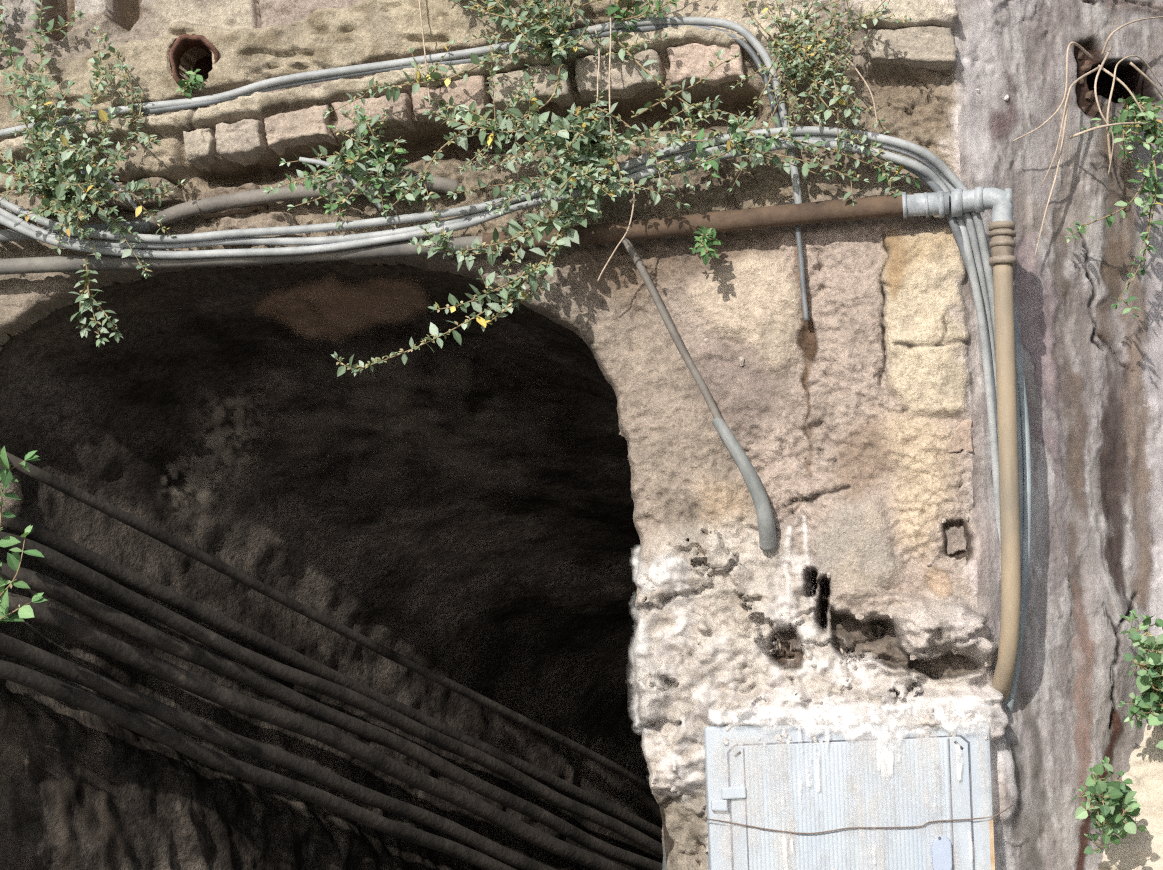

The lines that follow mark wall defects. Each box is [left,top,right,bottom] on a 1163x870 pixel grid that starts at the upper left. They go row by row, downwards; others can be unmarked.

crack [875,242,965,383]
damp [1053,256,1070,298]
crack [1079,232,1127,368]
damp [1098,127,1154,607]
damp [632,608,650,732]
spalling [772,628,807,669]
spalling [802,562,995,679]
spalling [942,515,972,560]
damp [1065,361,1093,820]